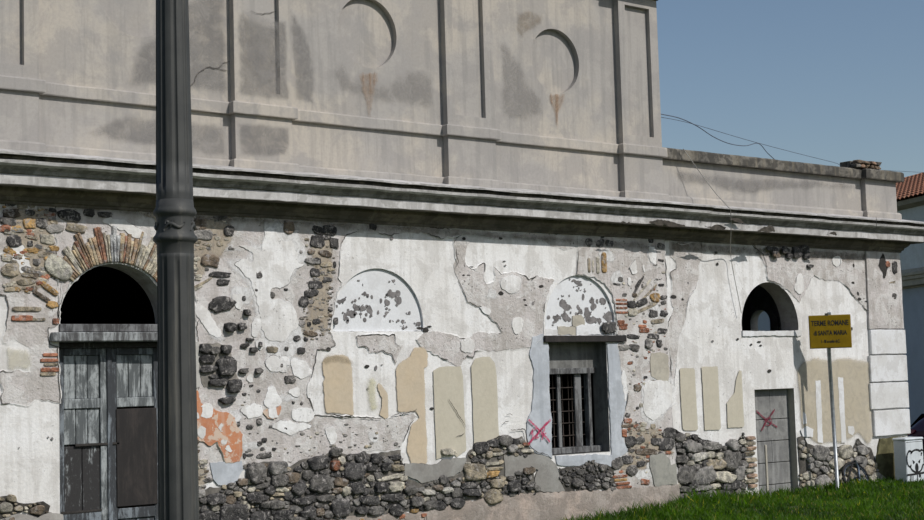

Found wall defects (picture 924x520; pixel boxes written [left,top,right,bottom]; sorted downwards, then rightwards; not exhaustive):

crack [192,61,230,85]
flaking render [753,245,888,312]
flaking render [194,215,703,490]